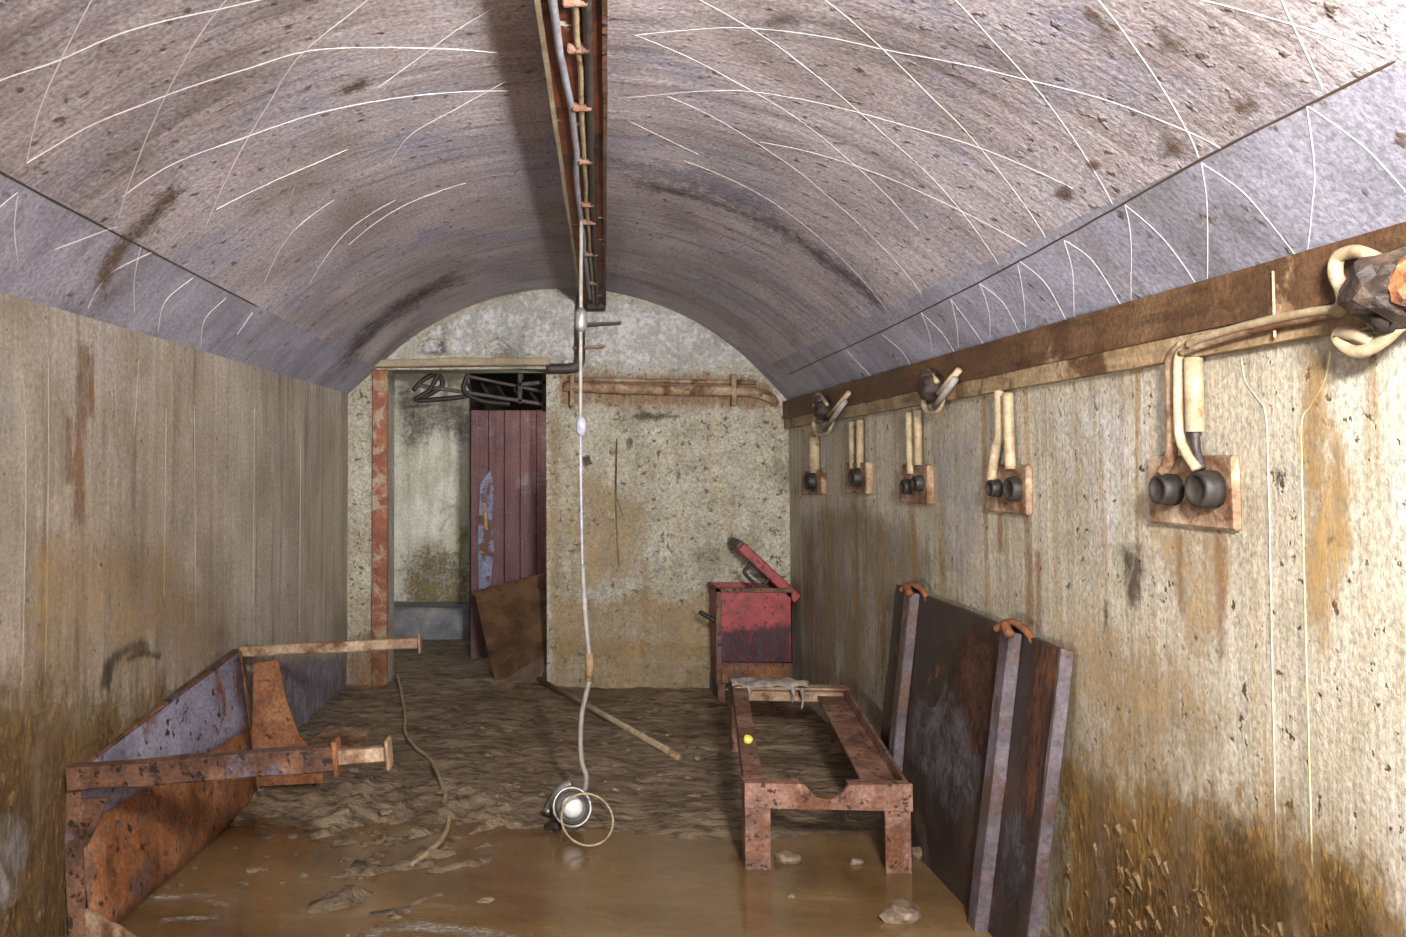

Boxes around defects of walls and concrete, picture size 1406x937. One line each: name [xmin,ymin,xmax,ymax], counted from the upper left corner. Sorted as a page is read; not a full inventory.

leakage [68,350,94,516]
leakage [0,640,190,937]
leakage [1050,746,1406,937]